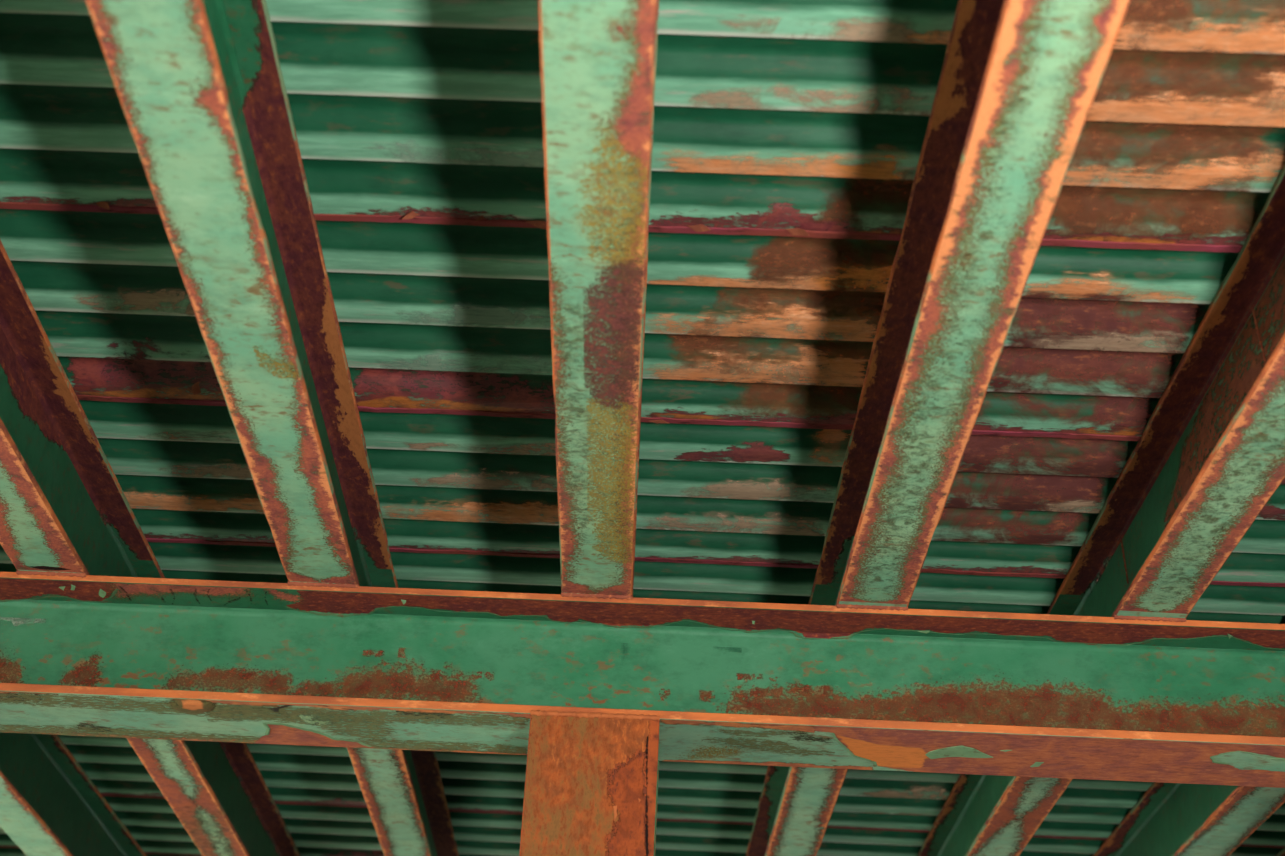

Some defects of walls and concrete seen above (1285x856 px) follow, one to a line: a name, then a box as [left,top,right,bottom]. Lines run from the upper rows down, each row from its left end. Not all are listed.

rust [0,0,1285,614]
peeling [0,578,119,626]
rust [0,646,104,695]
rust [161,647,530,719]
rust [660,673,1285,737]
peeling [520,715,651,856]
peeling [798,725,1285,788]